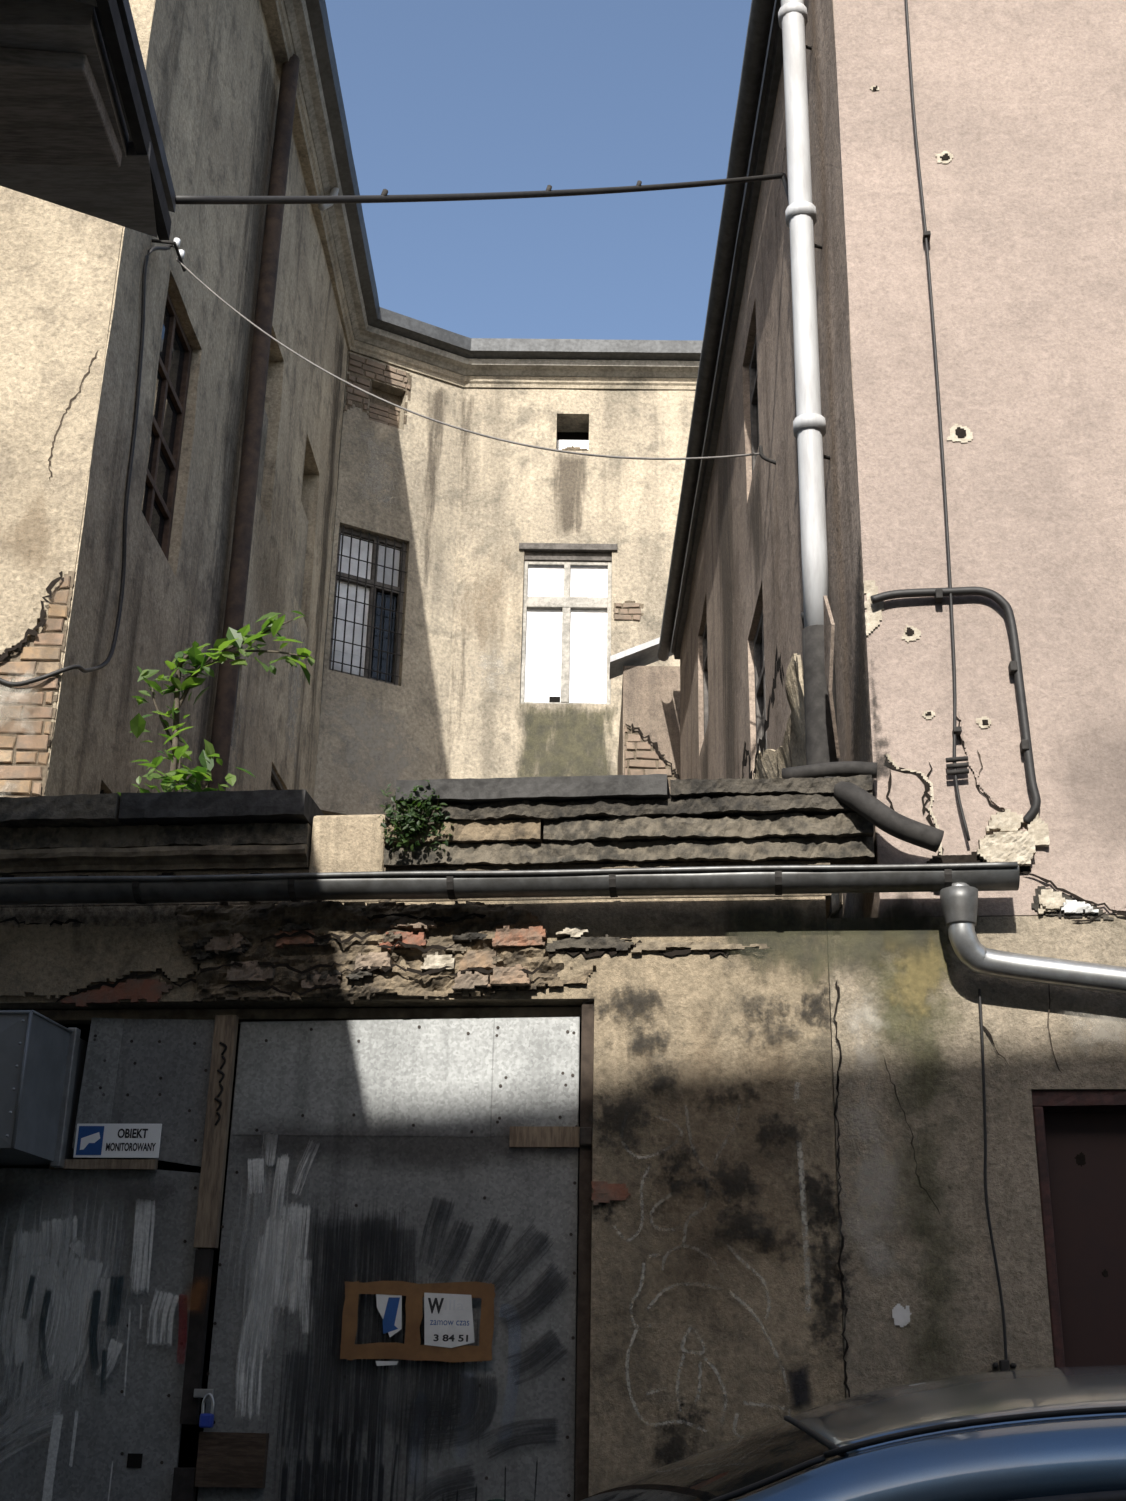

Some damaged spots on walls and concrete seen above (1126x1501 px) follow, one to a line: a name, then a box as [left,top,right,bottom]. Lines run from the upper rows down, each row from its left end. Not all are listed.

crack [48,351,98,480]
spalling [0,571,76,798]
water stain [519,706,612,777]
flaking render [739,647,806,779]
spalling [823,544,1050,874]
spalling [0,899,596,1007]
spalling [1038,889,1066,910]
water stain [589,986,676,1148]
water stain [660,1114,851,1351]
crack [833,979,850,1397]
crack [884,1058,940,1214]
water stain [655,1404,709,1464]